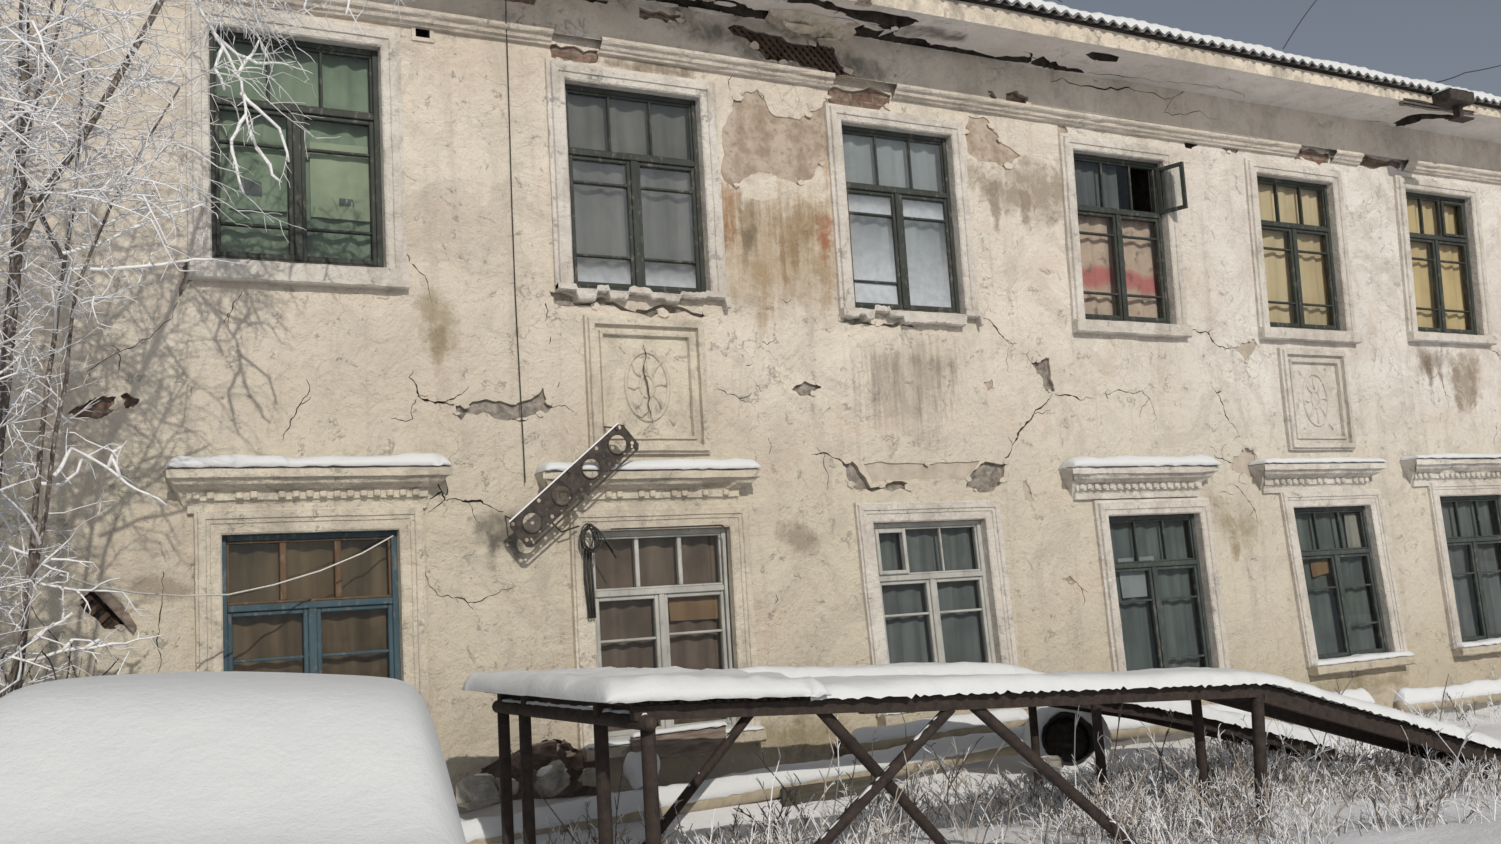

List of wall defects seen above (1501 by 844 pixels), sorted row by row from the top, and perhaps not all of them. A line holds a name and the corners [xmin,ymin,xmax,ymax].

spalling [550,41,599,64]
peeling [721,68,891,188]
leakage [975,162,1063,228]
spalling [65,393,139,420]
crack [391,372,468,422]
spalling [453,388,553,420]
crack [637,345,653,420]
crack [1005,389,1157,458]
leakage [1450,354,1477,408]
crack [427,481,503,523]
peeling [839,455,1032,502]
crack [425,572,511,610]